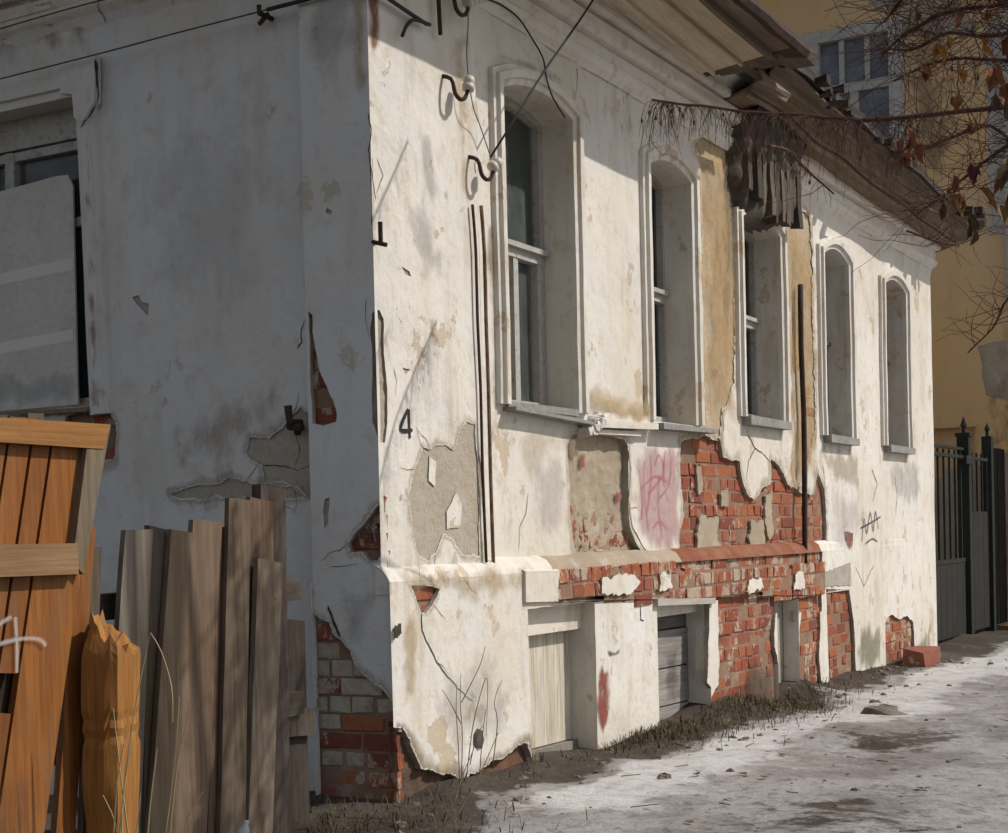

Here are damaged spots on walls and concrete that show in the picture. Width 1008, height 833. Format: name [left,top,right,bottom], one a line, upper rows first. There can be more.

corrosion [369,0,378,47]
spalling [0,388,118,466]
peeling [168,317,337,514]
spalling [555,137,853,702]
spalling [321,496,390,566]
spalling [314,606,535,803]
peeling [402,422,483,701]
spalling [885,615,940,668]